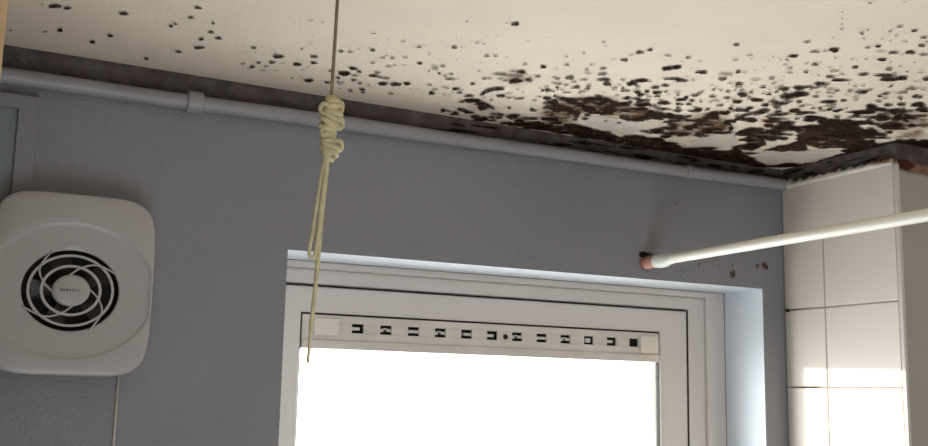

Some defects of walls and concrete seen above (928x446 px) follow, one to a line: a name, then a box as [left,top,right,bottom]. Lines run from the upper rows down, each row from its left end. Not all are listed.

water stain [2,45,326,112]
water stain [325,26,928,182]